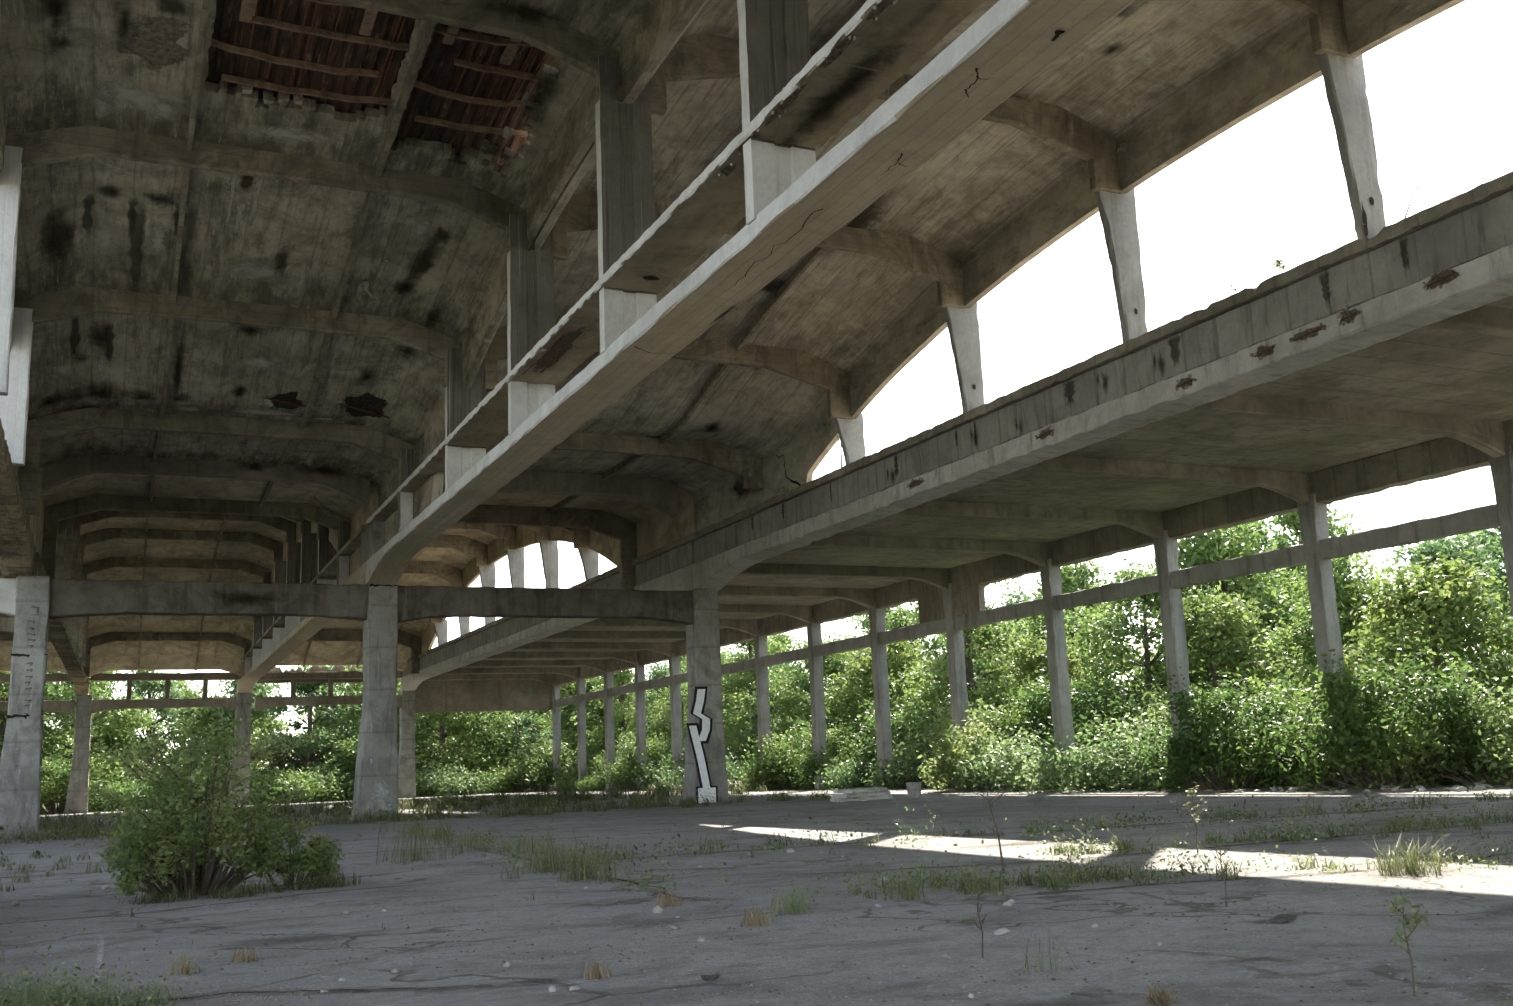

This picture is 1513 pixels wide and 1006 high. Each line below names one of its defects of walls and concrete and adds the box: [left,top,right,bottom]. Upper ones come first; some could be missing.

crack [965,68,979,98]
water stain [44,187,180,287]
water stain [395,216,449,293]
crack [735,209,823,285]
water stain [70,319,114,362]
spalling [262,392,306,409]
spalling [338,392,390,418]